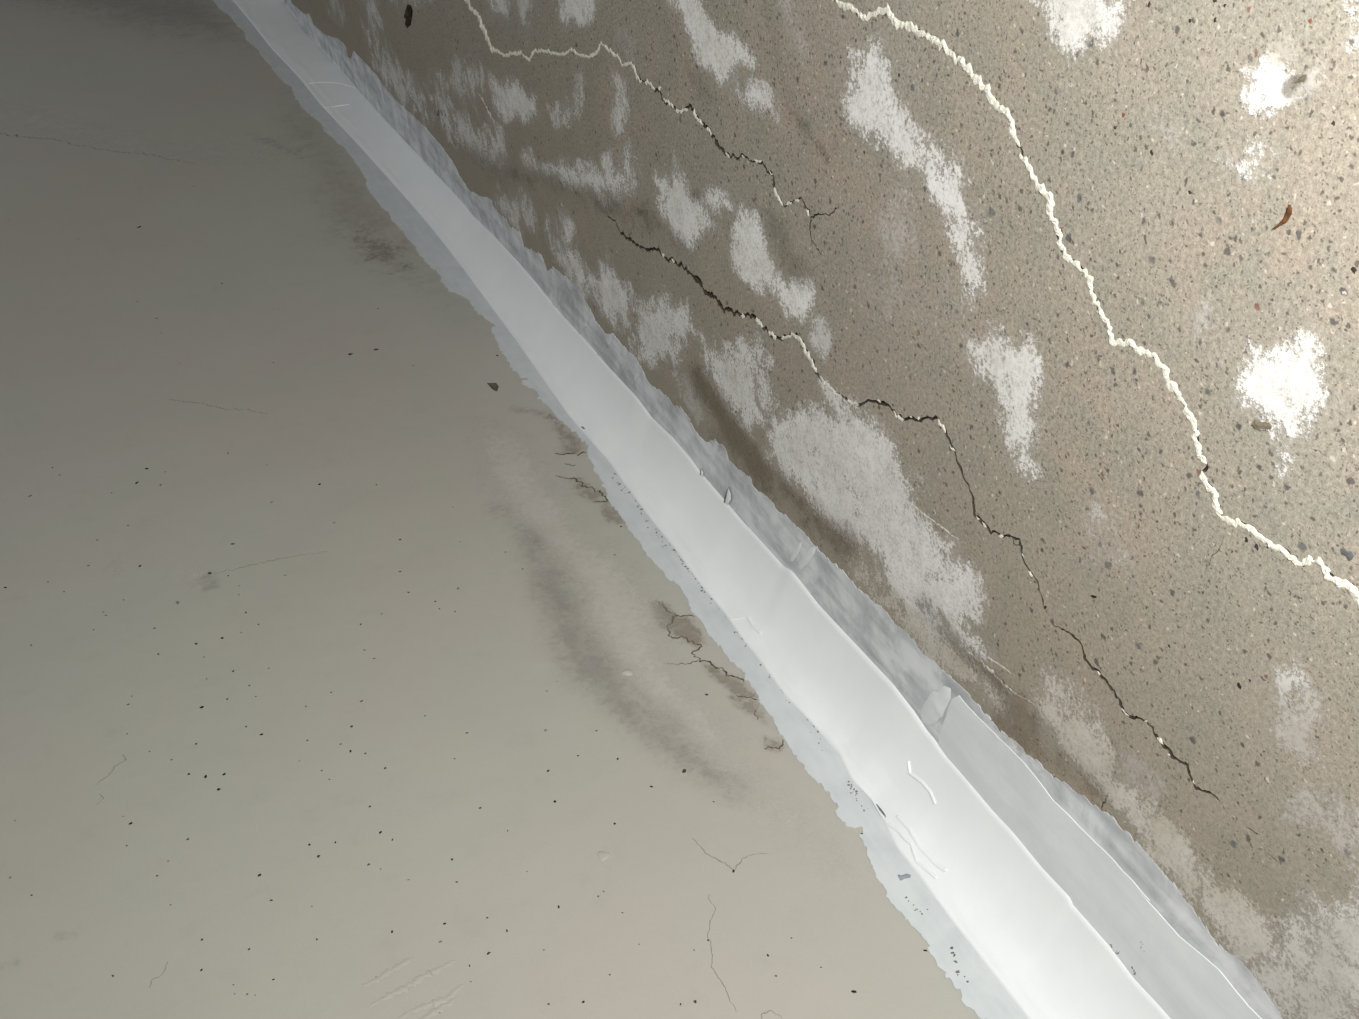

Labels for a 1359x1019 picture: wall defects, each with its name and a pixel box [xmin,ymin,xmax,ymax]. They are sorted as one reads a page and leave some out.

crack [464,0,837,255]
damp [1029,0,1127,61]
damp [1240,51,1316,120]
damp [362,0,1014,749]
crack [608,216,1220,801]
damp [966,320,1044,482]
crack [831,0,1359,608]
damp [1233,327,1330,479]